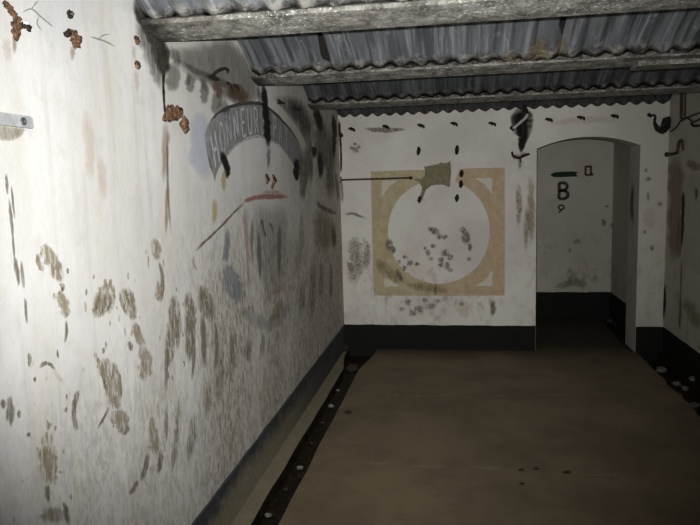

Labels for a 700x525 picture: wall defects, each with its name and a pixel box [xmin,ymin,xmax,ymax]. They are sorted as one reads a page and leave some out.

corrosion [10,21,23,47]
mould [424,227,453,271]